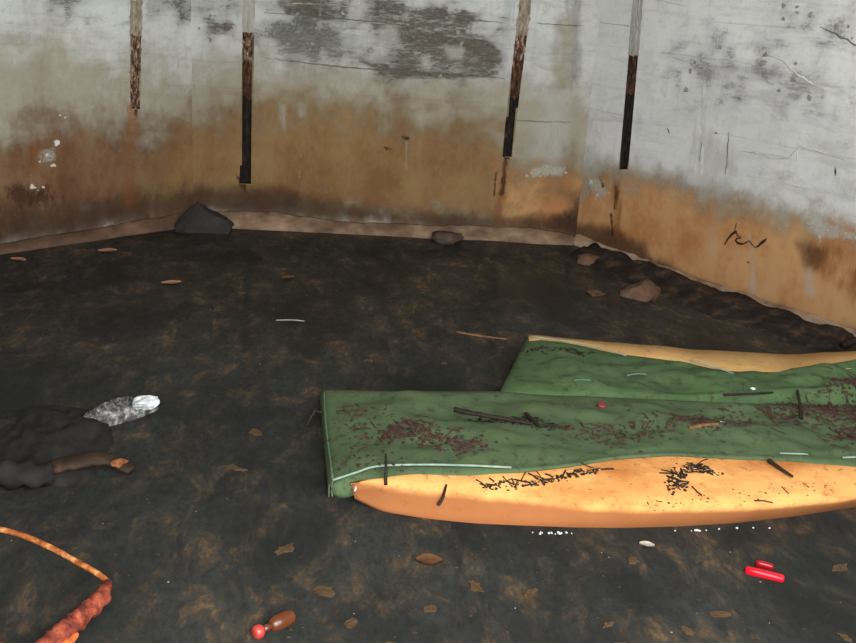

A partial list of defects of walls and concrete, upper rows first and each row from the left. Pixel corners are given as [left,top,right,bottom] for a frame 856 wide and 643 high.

rust [129,31,142,114]
rust [242,32,254,101]
rust [509,24,528,100]
rust [626,56,638,95]
leakage [0,54,856,329]
rust [493,157,509,196]